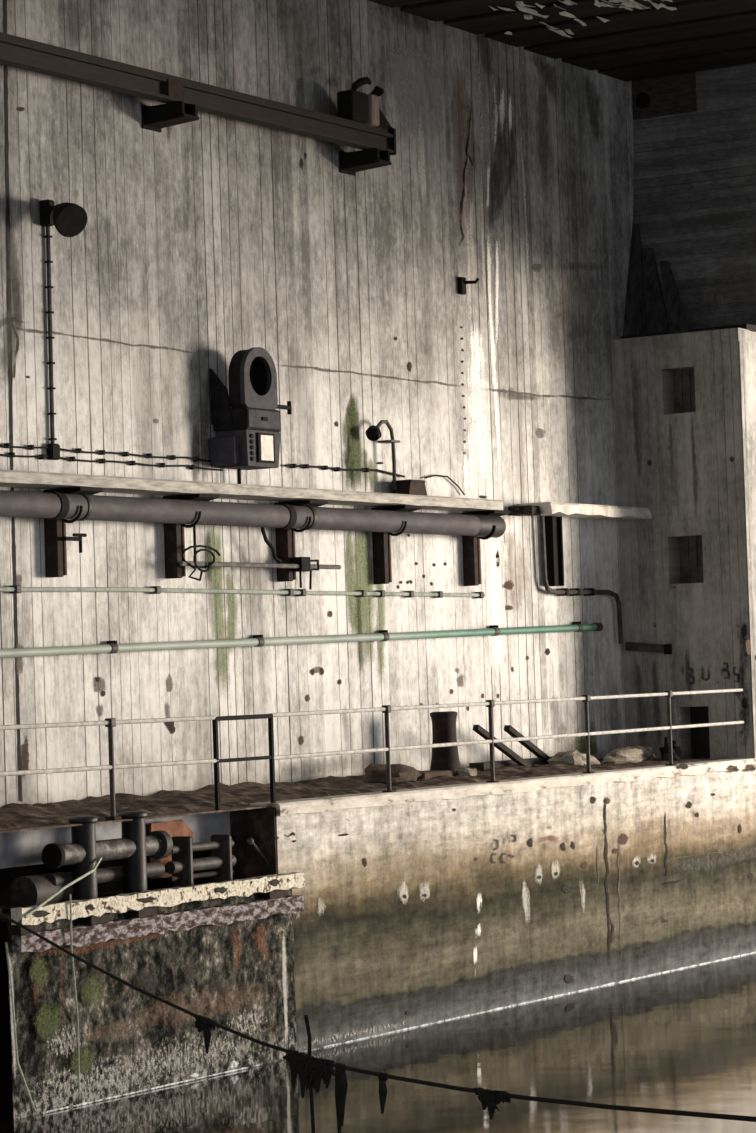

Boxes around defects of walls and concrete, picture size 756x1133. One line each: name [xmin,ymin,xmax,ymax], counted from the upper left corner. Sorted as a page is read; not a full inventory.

peeling [489,0,677,38]